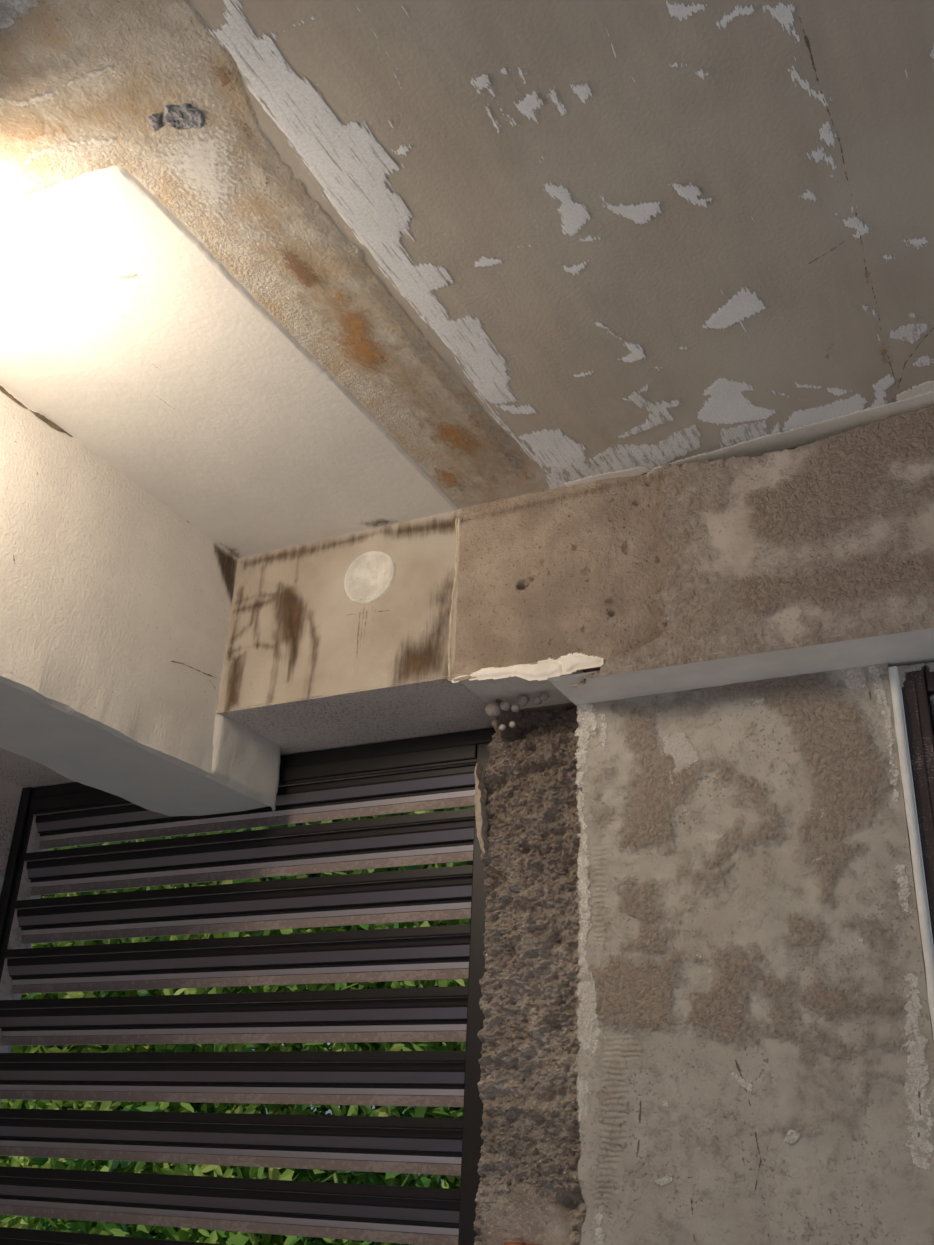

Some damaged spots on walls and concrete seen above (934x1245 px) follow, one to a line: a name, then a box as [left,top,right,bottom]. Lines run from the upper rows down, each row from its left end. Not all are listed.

crack [801,22,932,388]
corrosion [276,246,325,288]
spalling [0,0,934,681]
leakage [373,518,456,535]
leakage [215,546,263,607]
leakage [276,589,318,669]
leakage [398,599,449,680]
leakage [225,649,243,711]